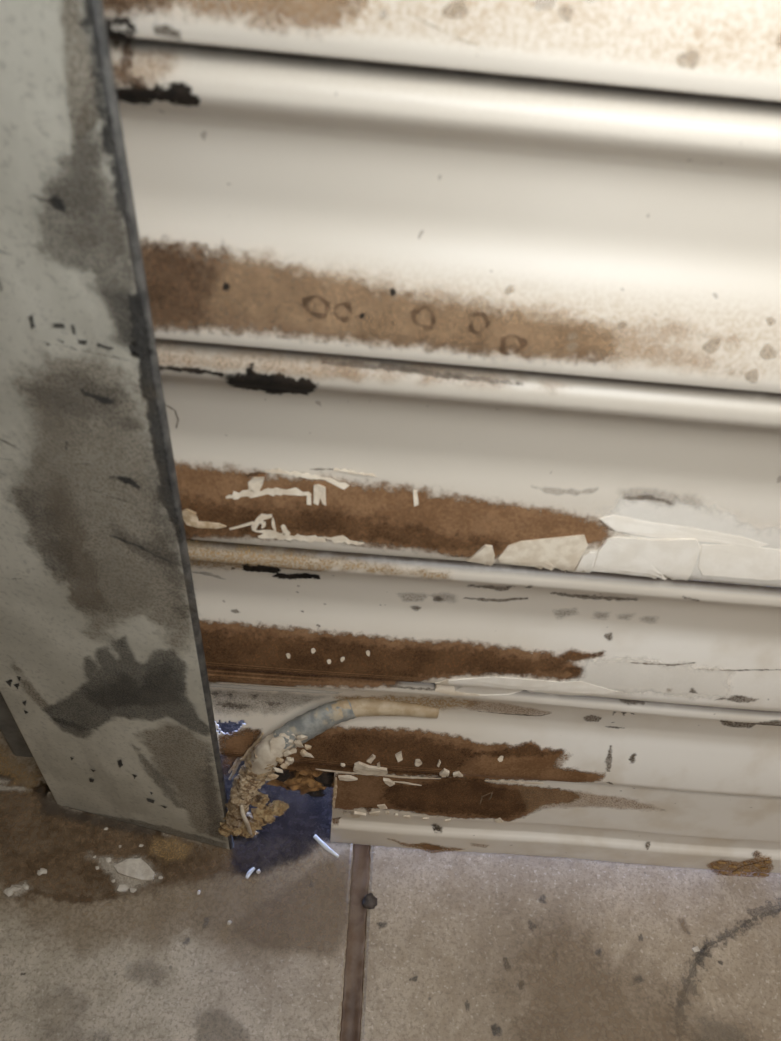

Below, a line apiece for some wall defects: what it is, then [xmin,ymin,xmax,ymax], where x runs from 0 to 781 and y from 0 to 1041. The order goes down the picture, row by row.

rust [102,0,359,30]
rust [140,240,699,364]
peeling [129,295,376,545]
rust [174,462,609,574]
peeling [455,514,781,580]
rust [199,620,603,716]
leakage [217,720,246,734]
peeling [265,734,314,781]
rust [218,726,651,838]
leakage [0,746,348,954]
rust [708,852,773,877]